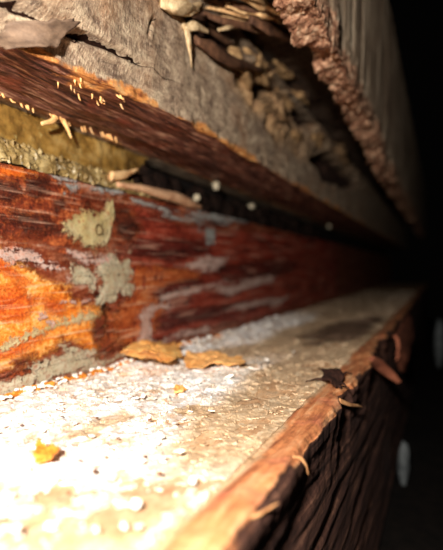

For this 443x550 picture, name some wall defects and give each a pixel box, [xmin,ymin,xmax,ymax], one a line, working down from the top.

crack [65,33,179,84]
spalling [0,136,248,352]
rust [0,162,338,383]